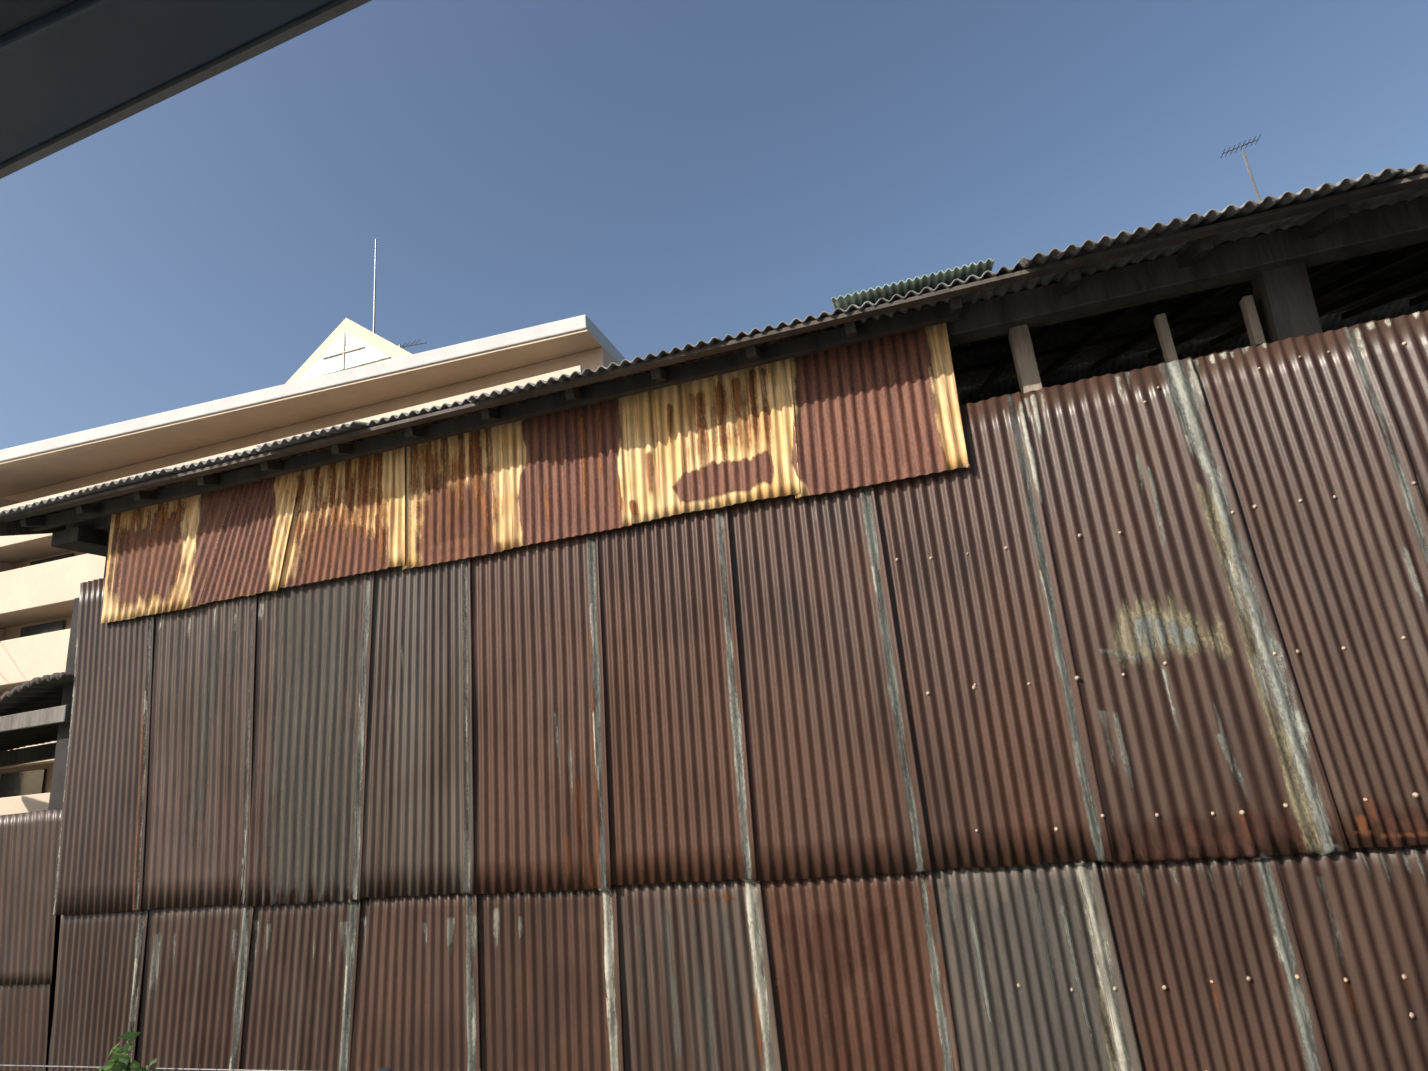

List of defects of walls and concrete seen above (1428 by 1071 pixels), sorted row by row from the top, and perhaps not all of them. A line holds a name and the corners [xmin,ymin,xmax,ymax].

rust [107,460,276,612]
rust [286,453,389,587]
rust [411,428,502,566]
rust [518,380,652,545]
rust [673,369,774,505]
rust [792,328,945,495]
leakage [1403,548,1423,602]
leakage [1100,595,1230,726]
leakage [1214,705,1243,785]
leakage [937,867,1113,1071]